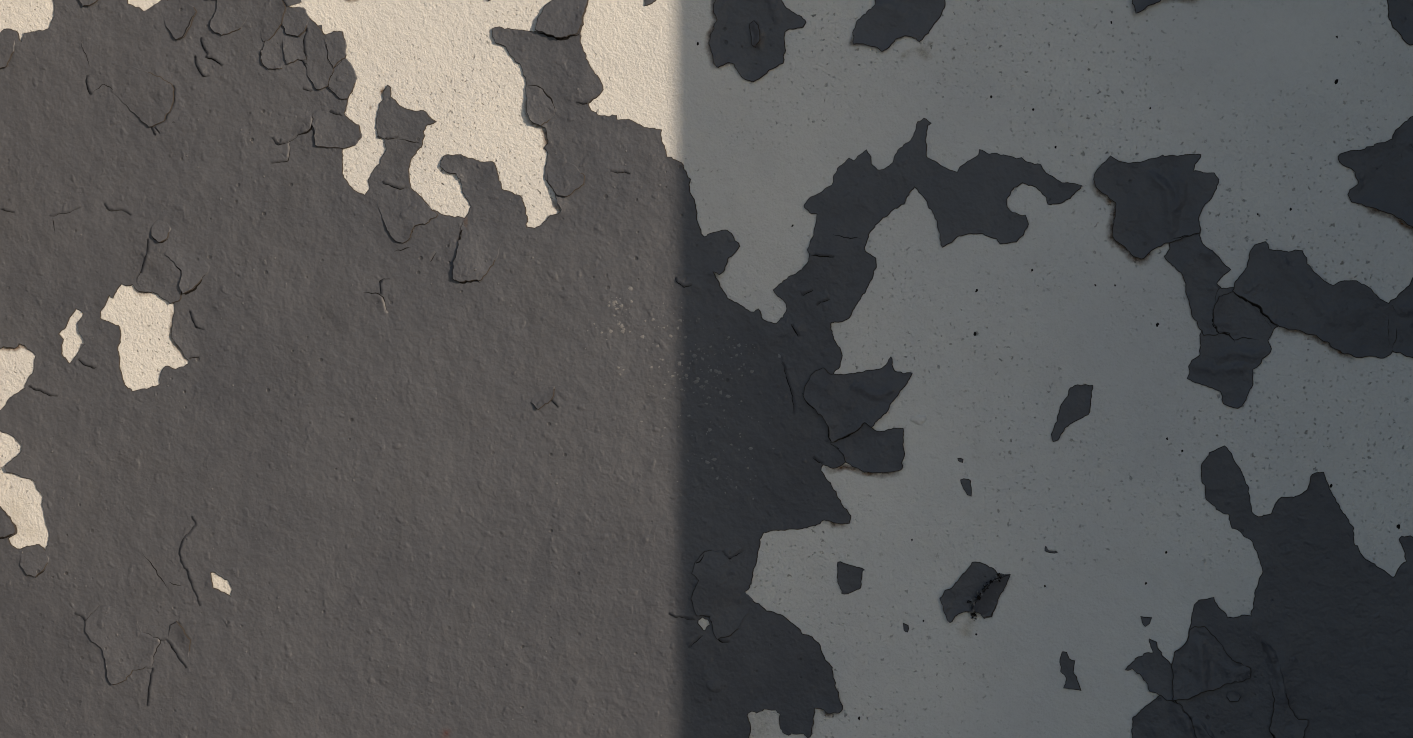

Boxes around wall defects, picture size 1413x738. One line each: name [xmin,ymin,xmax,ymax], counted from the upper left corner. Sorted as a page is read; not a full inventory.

peeling [0,0,54,69]
peeling [260,0,588,244]
peeling [0,344,36,410]
peeling [60,309,85,363]
peeling [101,221,210,391]
peeling [452,222,503,282]
peeling [581,0,1413,738]
peeling [0,431,49,577]
crack [75,515,203,707]
peeling [211,572,232,596]